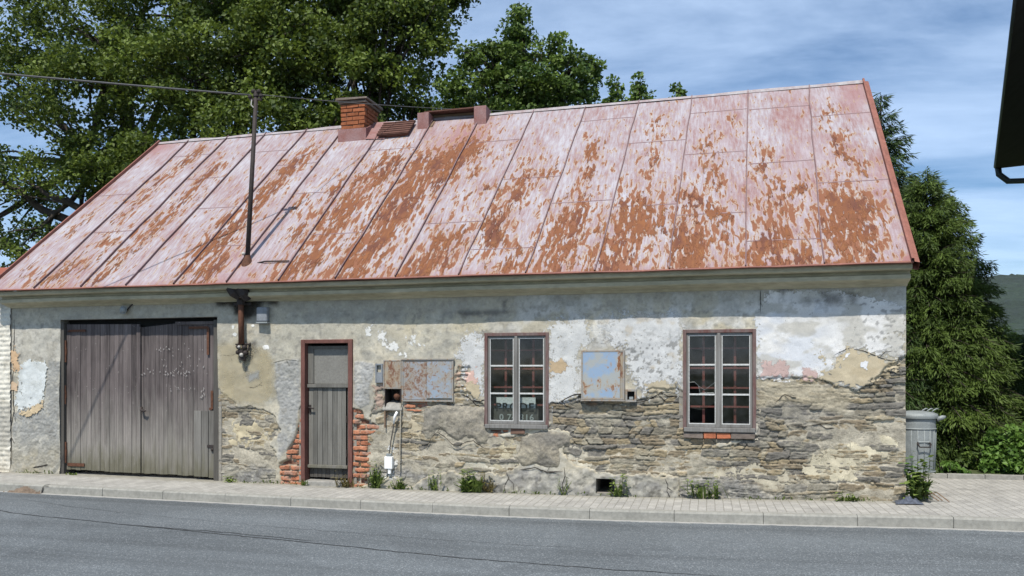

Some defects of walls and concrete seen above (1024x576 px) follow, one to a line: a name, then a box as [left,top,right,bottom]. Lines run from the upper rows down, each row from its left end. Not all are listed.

rust [19,145,234,288]
rust [172,145,322,284]
rust [267,118,898,281]
rust [821,104,868,178]
peeling [10,345,48,417]
spalling [218,393,301,485]
spalling [353,328,525,487]
spalling [543,289,906,501]